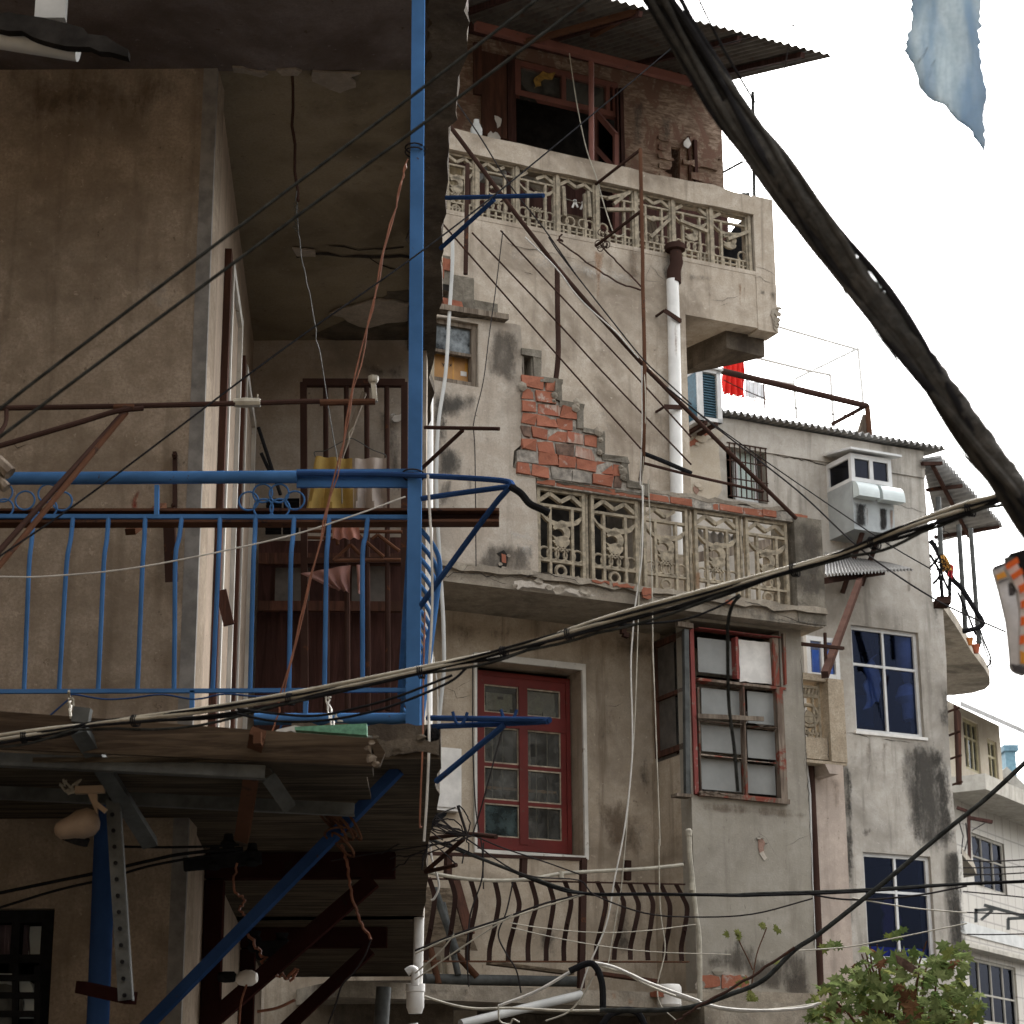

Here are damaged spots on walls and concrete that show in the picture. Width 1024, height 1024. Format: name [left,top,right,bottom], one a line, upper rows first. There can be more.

peeling [232,66,361,93]
peeling [329,297,409,328]
water stain [493,333,513,377]
spalling [514,374,705,506]
spalling [713,504,777,518]
spalling [497,550,652,600]
water stain [906,748,951,845]
water stain [946,854,965,953]